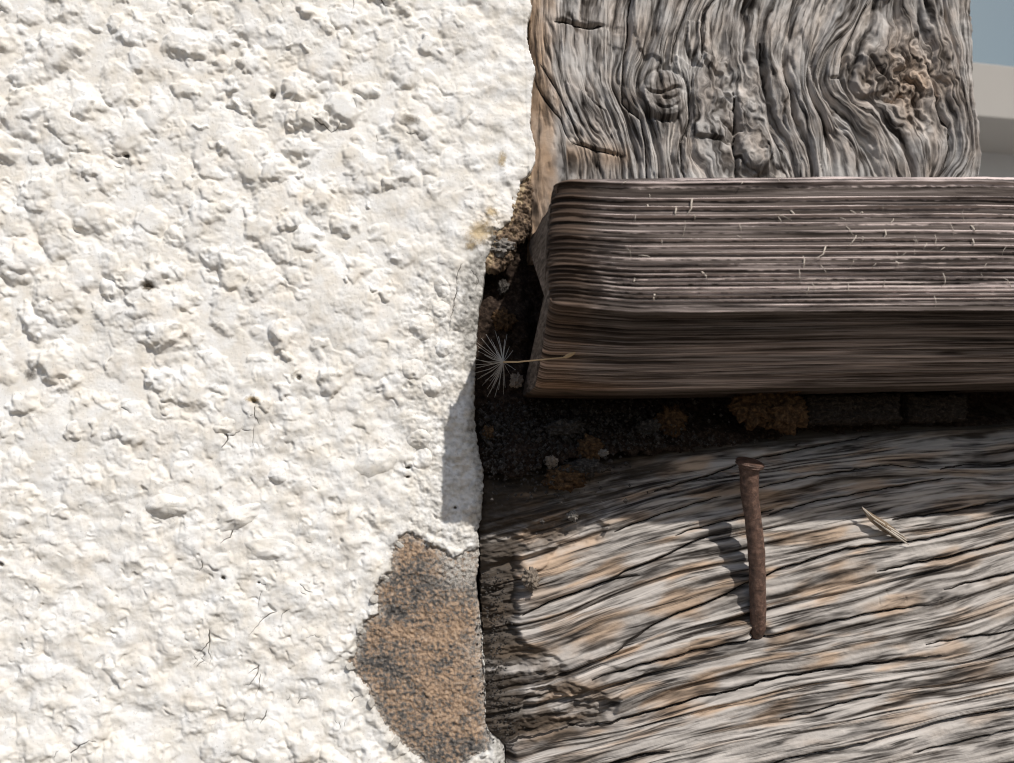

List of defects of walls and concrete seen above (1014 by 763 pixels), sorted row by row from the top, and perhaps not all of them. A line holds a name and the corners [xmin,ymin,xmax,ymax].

spalling [345,533,491,763]